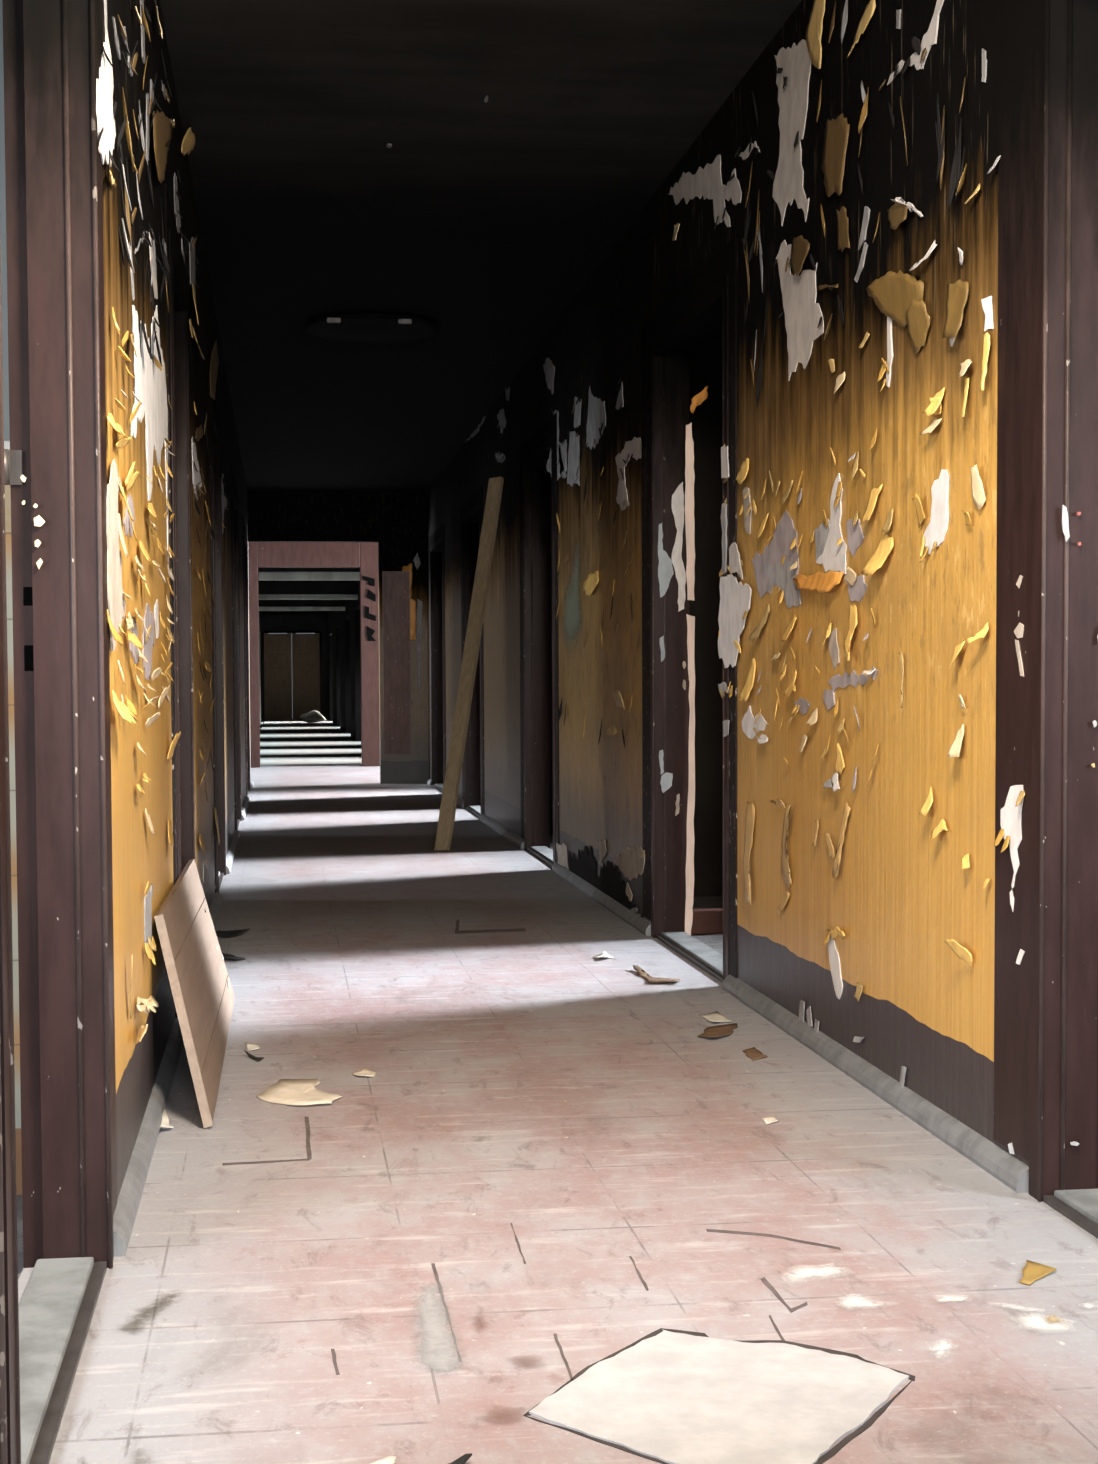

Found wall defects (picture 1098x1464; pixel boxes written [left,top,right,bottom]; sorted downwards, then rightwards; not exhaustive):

peeling [669,0,1001,418]
peeling [96,0,230,887]
peeling [543,358,642,647]
peeling [919,388,945,435]
peeling [912,465,986,563]
flaking render [658,386,708,935]
peeling [718,427,894,793]
peeling [947,695,966,758]
peeling [1014,623,1024,677]
peeling [994,785,1025,911]
peeling [130,881,158,1045]
peeling [822,927,863,1001]